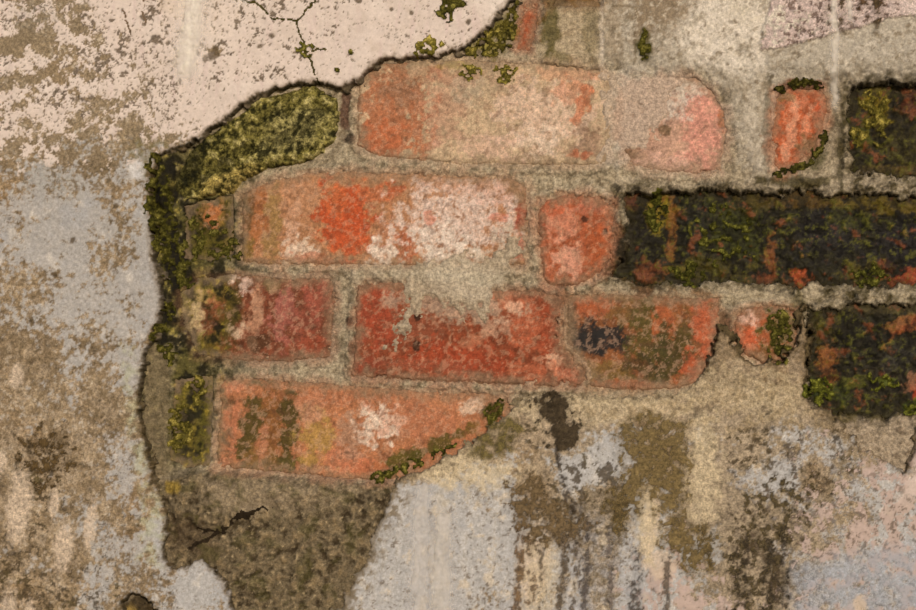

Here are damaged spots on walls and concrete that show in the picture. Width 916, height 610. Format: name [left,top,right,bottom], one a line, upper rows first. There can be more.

crack [122,0,147,35]
crack [235,0,327,85]
spalling [142,0,916,487]
leakage [472,417,523,459]
spalling [124,593,154,610]
spalling [157,470,405,610]
leakage [503,390,833,610]
peeling [649,526,742,610]
peeling [785,475,916,610]